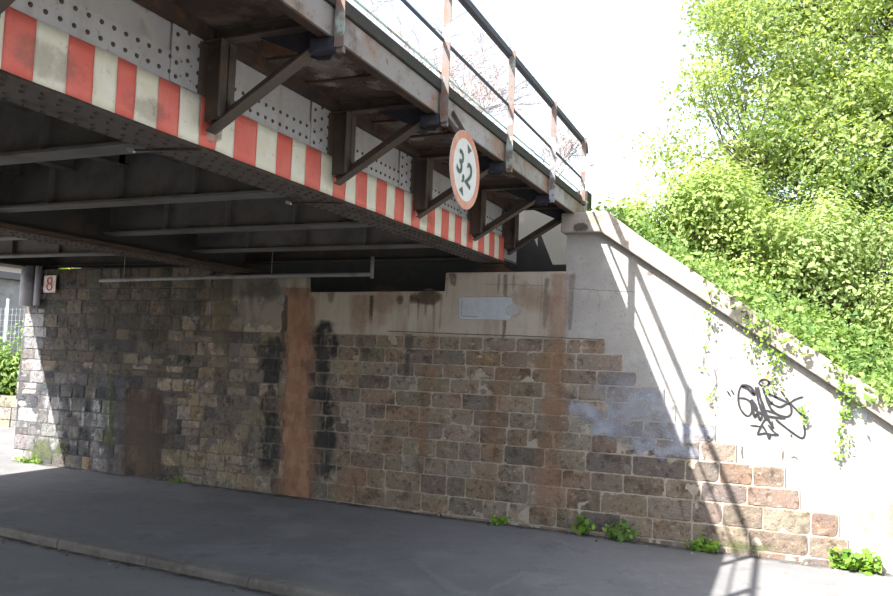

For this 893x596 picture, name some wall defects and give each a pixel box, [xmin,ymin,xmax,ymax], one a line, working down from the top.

rust [281,288,312,498]